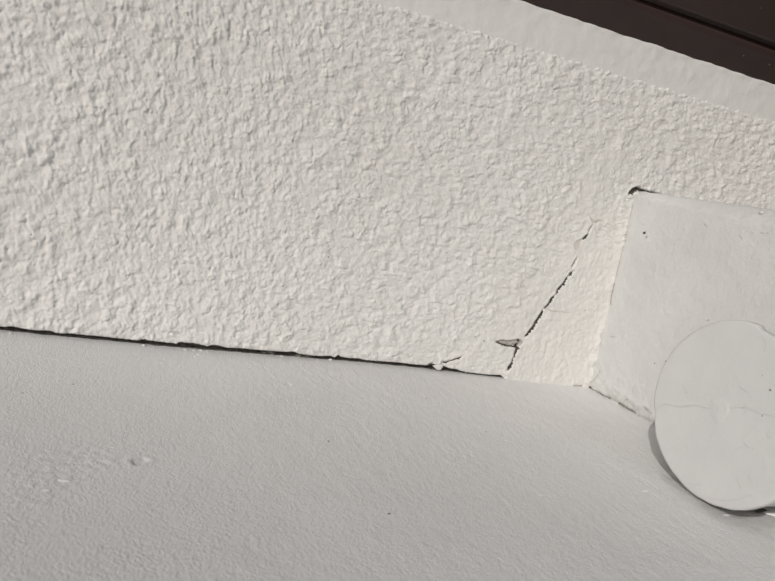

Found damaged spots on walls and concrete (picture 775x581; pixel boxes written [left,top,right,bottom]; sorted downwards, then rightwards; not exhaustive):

crack [610,187,654,304]
spalling [496,339,523,347]
crack [507,258,586,370]